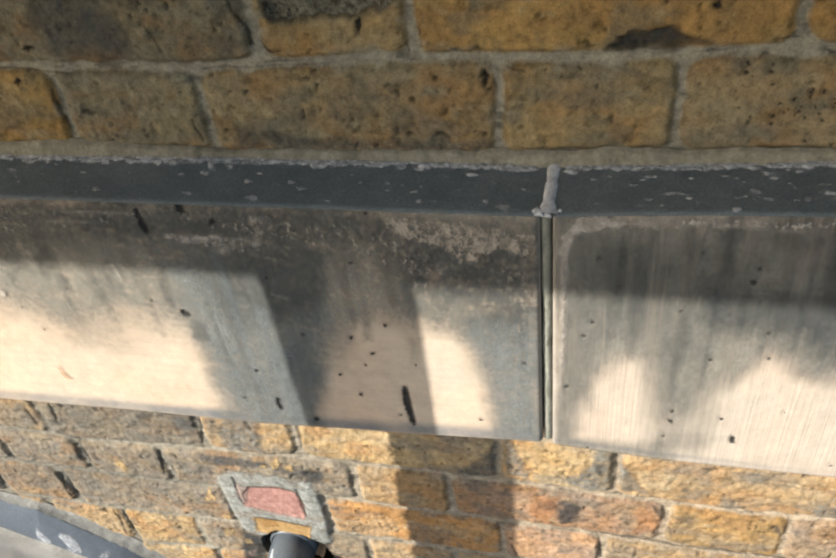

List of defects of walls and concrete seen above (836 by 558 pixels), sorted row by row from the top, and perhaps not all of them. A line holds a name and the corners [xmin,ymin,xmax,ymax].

damp [0,154,537,176]
damp [0,200,540,438]
damp [558,216,836,441]